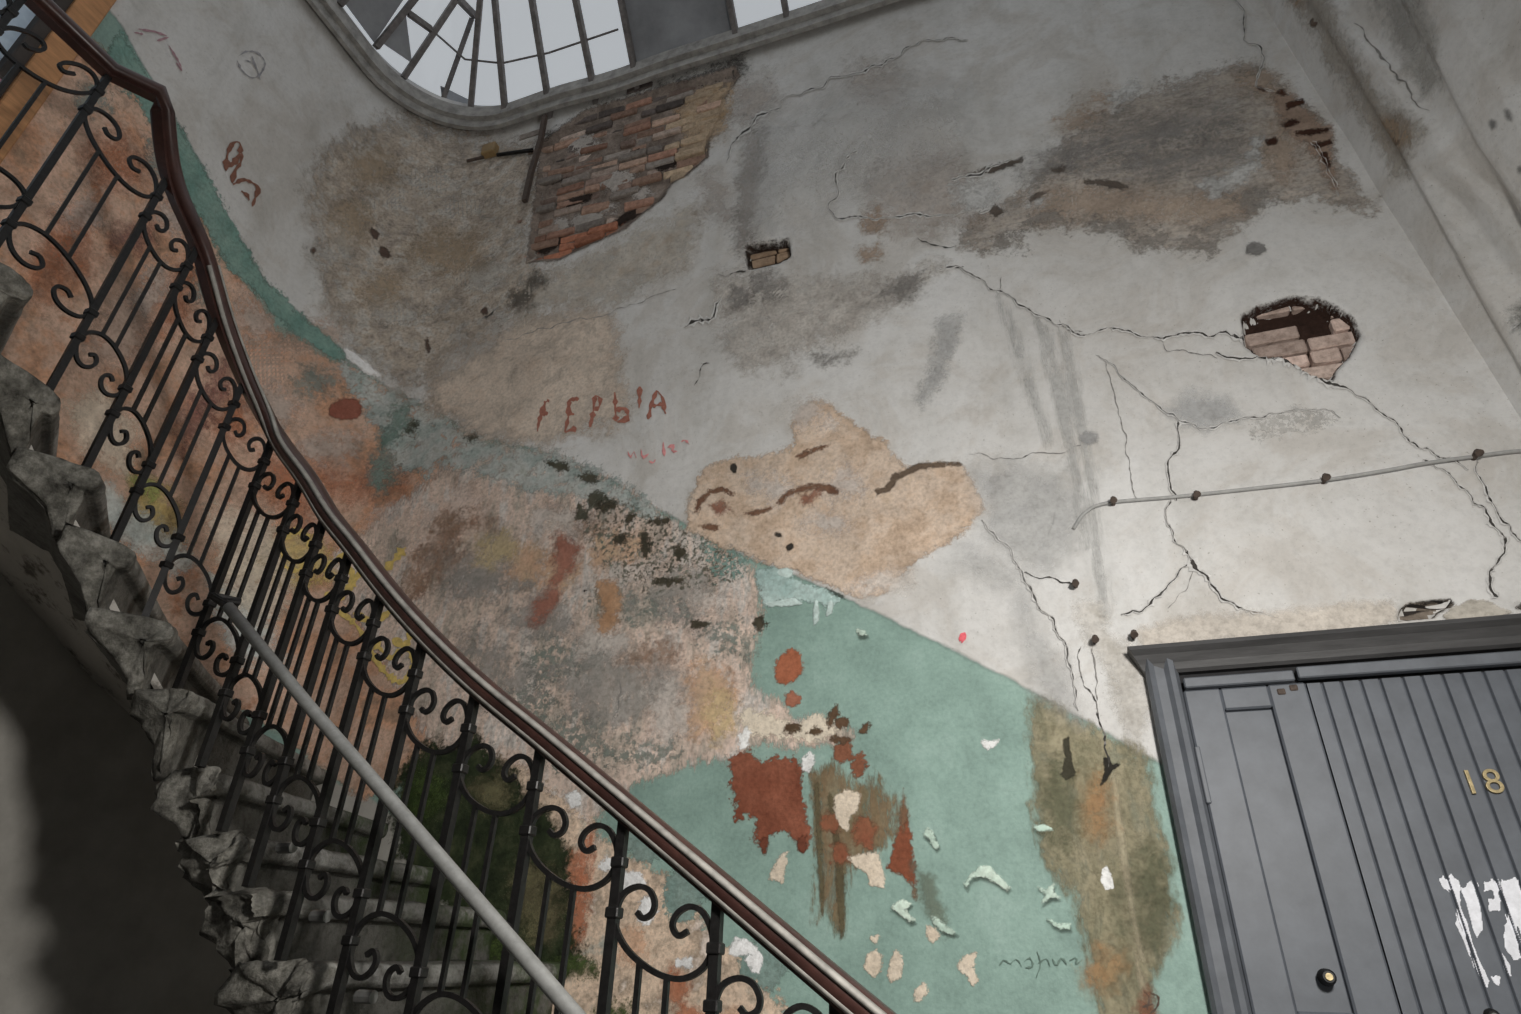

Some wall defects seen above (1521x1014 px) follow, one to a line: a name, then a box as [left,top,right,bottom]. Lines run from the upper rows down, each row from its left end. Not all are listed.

flaking render [948,61,1381,258]
peeling [200,66,984,791]
damp [1026,321,1097,492]
crack [726,23,1521,618]
spalling [1242,297,1360,381]
peeling [0,55,788,1014]
crack [982,520,1110,767]
peeling [834,789,861,832]
peeling [863,934,904,983]
peeling [847,852,955,943]
peeling [956,951,979,986]
damp [1028,512,1181,1014]